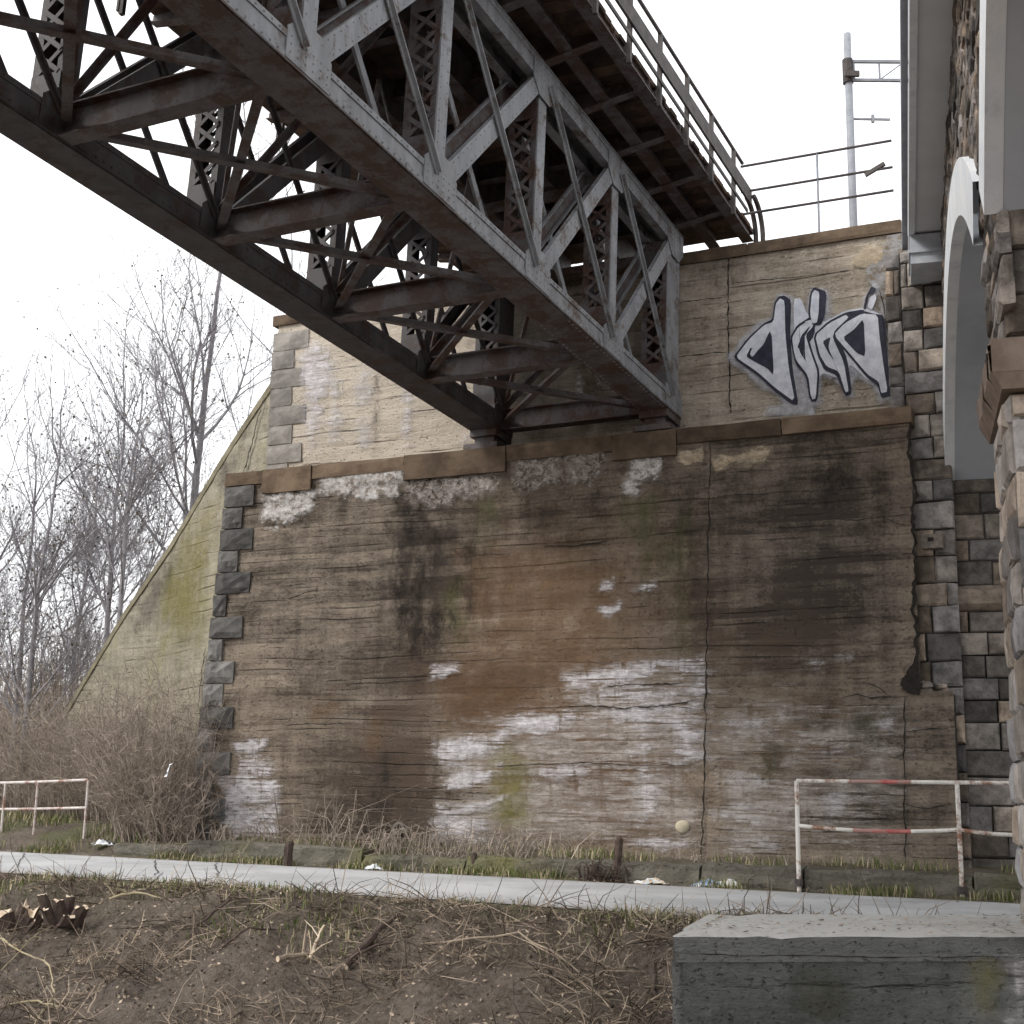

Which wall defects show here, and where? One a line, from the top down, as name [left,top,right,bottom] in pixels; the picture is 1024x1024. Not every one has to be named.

crack [679,257,850,409]
damp [599,602,622,613]
crack [498,441,815,859]
damp [219,739,280,837]
damp [434,660,710,846]